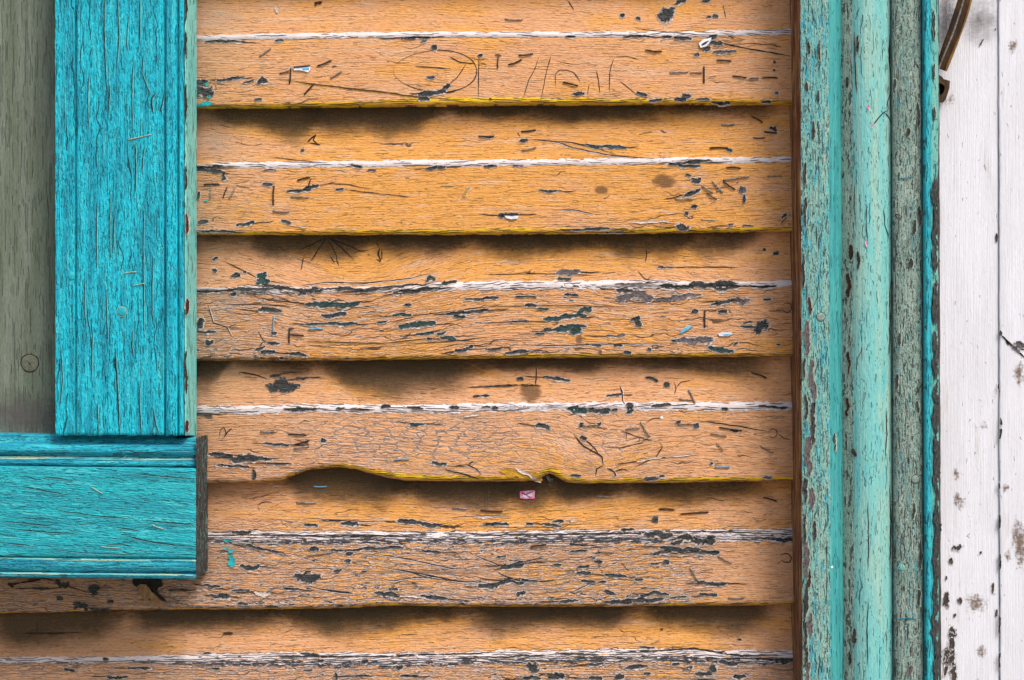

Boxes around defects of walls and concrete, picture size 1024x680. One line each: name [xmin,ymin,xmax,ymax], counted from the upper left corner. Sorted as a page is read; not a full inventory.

damp [653,175,674,187]
peeling [660,158,721,199]
peeling [184,271,458,346]
peeling [385,269,643,356]
peeling [604,279,777,314]
crack [1001,336,1024,358]
peeling [565,393,636,417]
peeling [911,179,963,680]
peeling [207,441,306,480]
peeling [620,516,721,557]
peeling [465,543,588,598]
peeling [488,652,649,680]